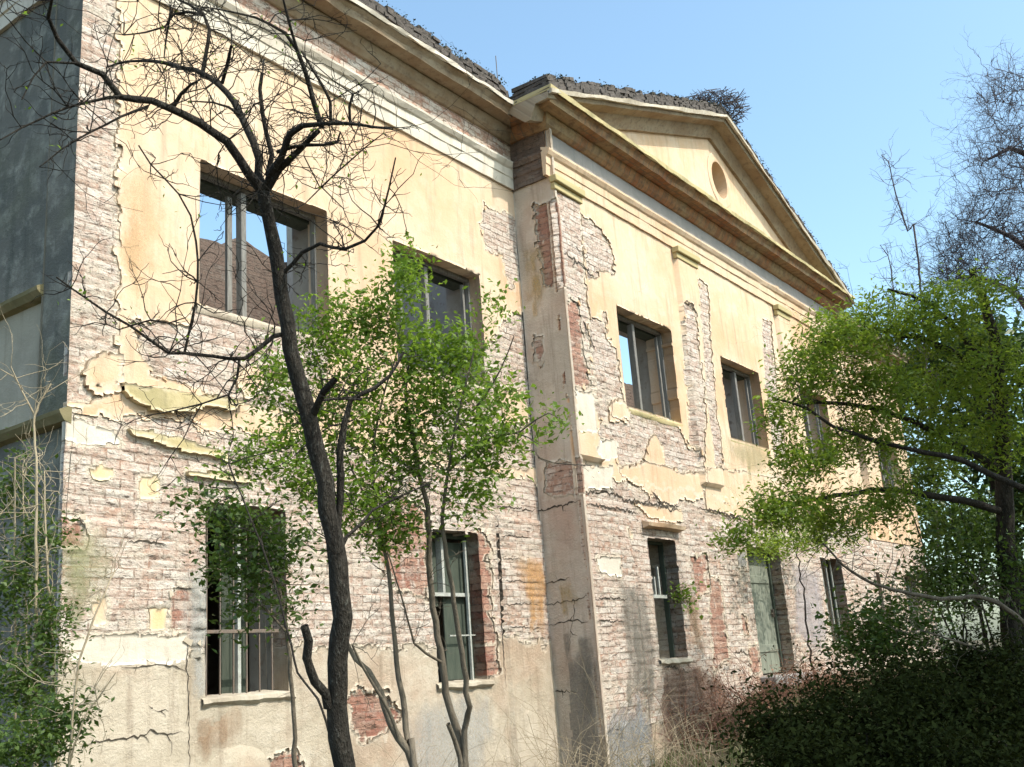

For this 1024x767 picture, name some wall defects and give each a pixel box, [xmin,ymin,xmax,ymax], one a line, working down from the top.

spalling [532,192,725,473]